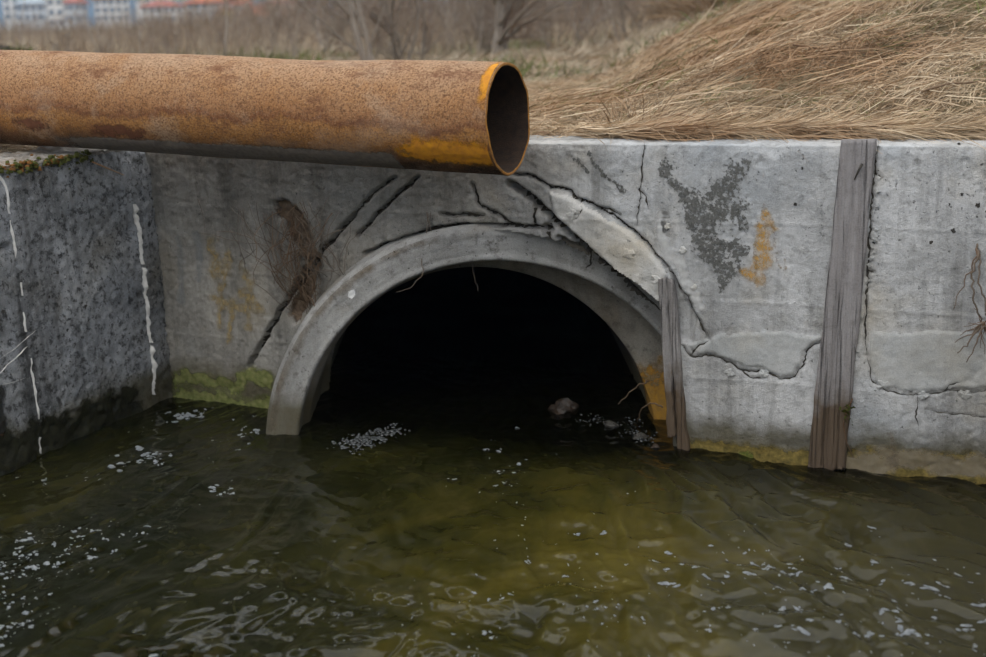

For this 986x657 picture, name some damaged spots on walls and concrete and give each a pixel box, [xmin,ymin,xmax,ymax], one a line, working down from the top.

corrosion [478,63,499,102]
corrosion [92,124,146,140]
corrosion [395,137,492,166]
crack [257,144,821,379]
corrosion [741,210,775,282]
water stain [141,268,158,395]
water stain [0,358,40,434]